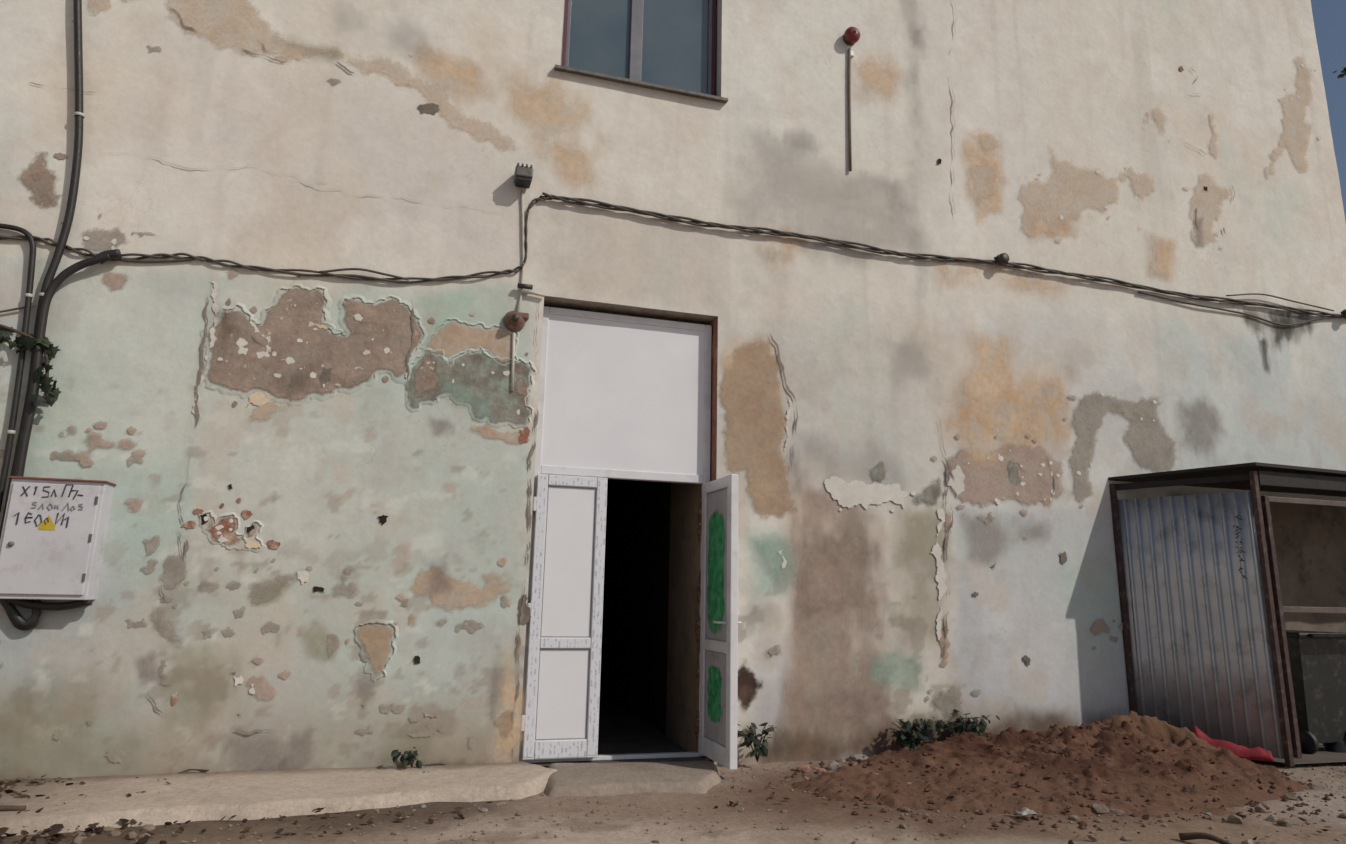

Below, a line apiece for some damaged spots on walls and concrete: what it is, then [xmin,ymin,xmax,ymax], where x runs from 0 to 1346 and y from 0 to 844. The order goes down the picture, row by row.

peeling [168,0,515,149]
peeling [20,153,68,207]
peeling [83,214,158,290]
peeling [1020,155,1155,243]
peeling [51,421,146,467]
crack [177,281,220,563]
spalling [199,275,537,444]
peeling [720,334,798,516]
spalling [824,393,1176,525]
leakage [1245,313,1310,368]
peeling [126,498,363,641]
peeling [326,557,512,683]